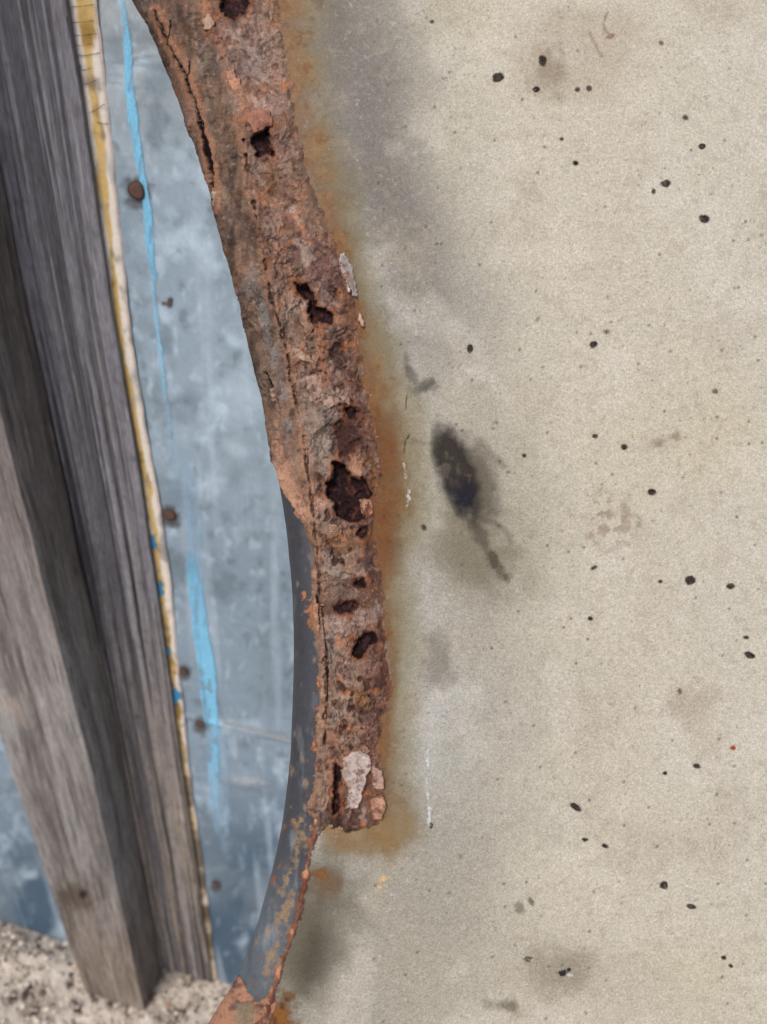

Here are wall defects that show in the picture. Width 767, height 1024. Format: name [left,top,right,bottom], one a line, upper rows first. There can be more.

corrosion [132,0,412,1024]
water stain [488,551,508,580]